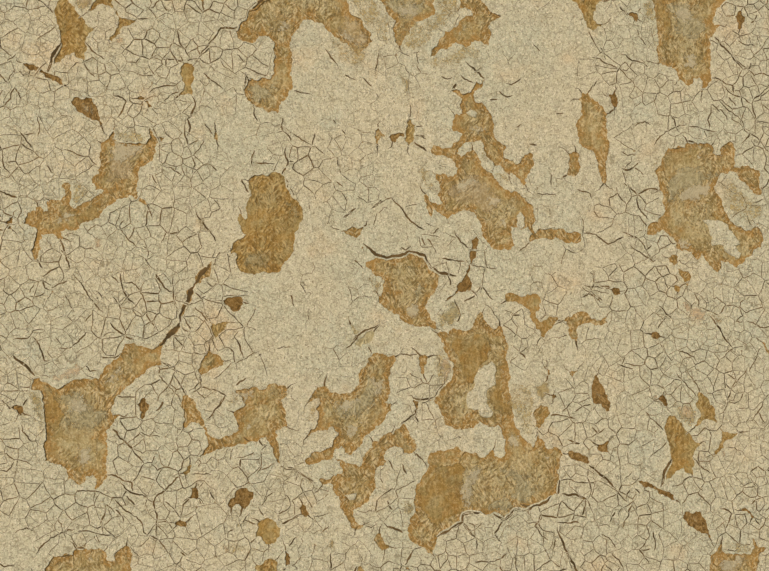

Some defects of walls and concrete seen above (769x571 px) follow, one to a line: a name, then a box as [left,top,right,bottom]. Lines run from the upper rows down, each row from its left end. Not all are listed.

peeling [16,0,151,88]
peeling [235,0,374,121]
peeling [619,0,747,103]
crack [635,37,769,152]
crack [15,220,211,362]
peeling [0,54,620,571]
crack [343,197,465,285]
peeling [637,134,766,302]
crack [694,293,769,423]
crack [15,428,186,565]
crack [383,465,640,571]
peeling [632,370,769,571]